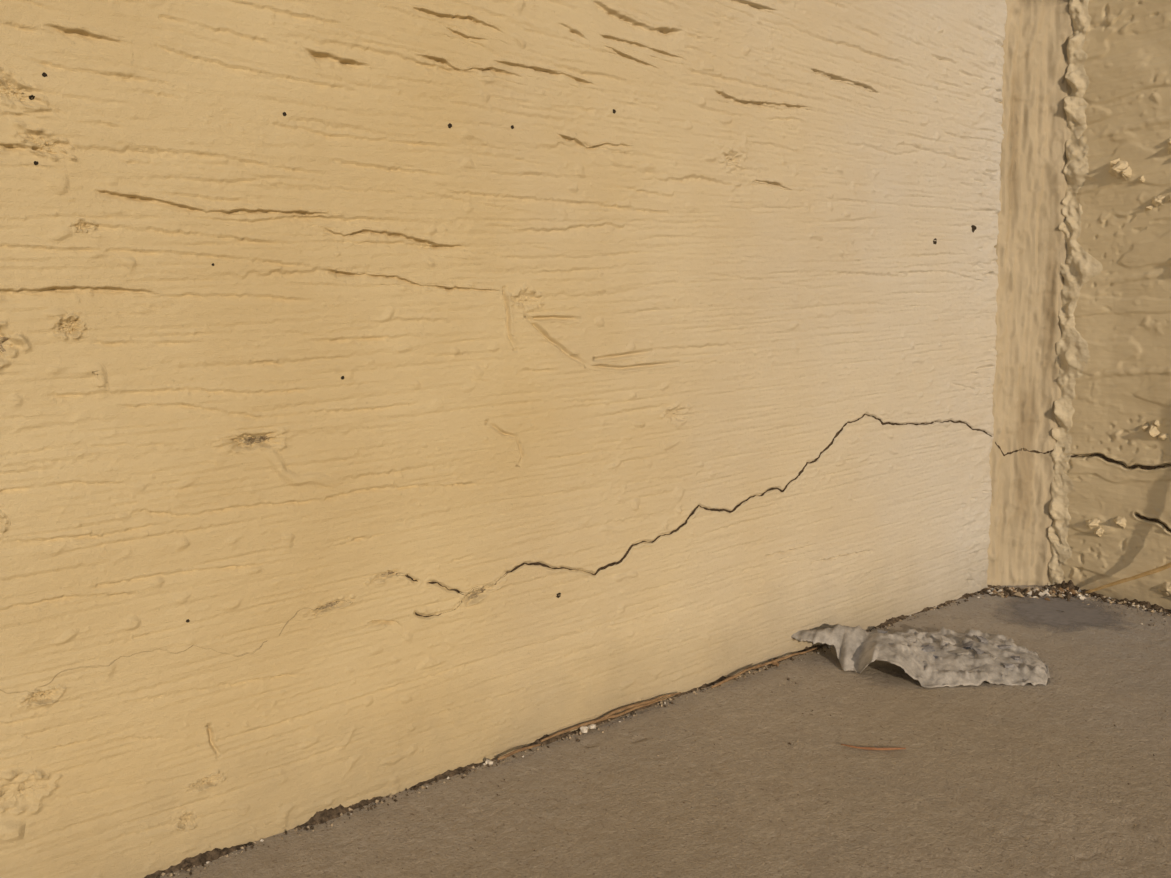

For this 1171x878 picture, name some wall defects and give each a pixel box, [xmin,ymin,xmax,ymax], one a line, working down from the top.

spalling [0,284,165,378]
spalling [206,424,301,457]
crack [396,414,1171,617]